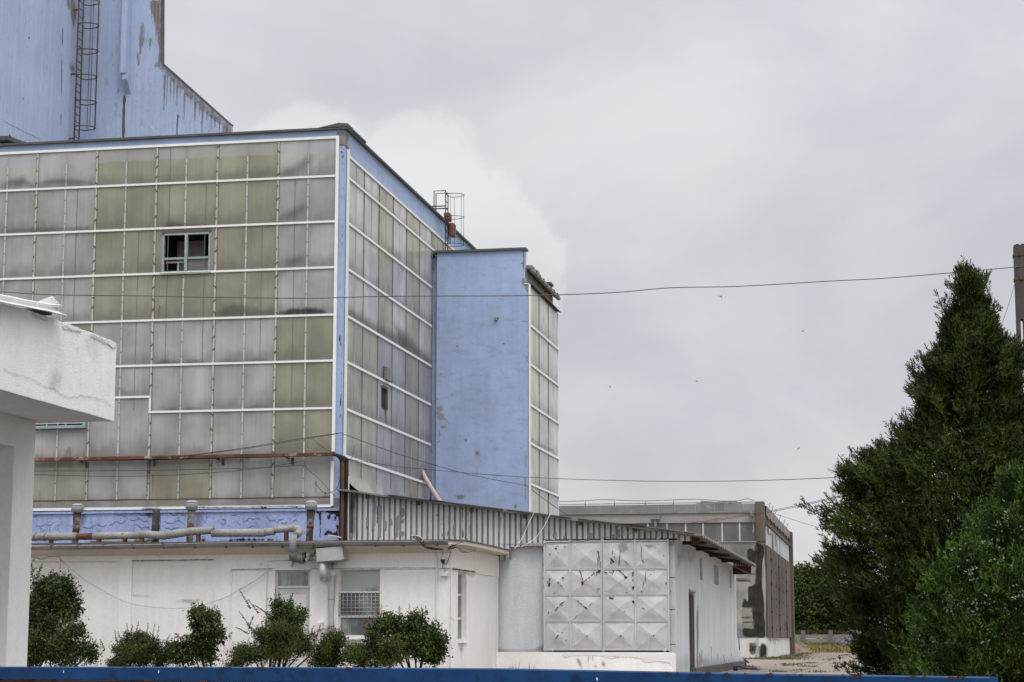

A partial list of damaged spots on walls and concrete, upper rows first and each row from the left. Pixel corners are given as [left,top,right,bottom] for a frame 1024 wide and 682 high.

leakage [137,0,231,132]
corrosion [579,543,651,612]
leakage [742,543,774,658]